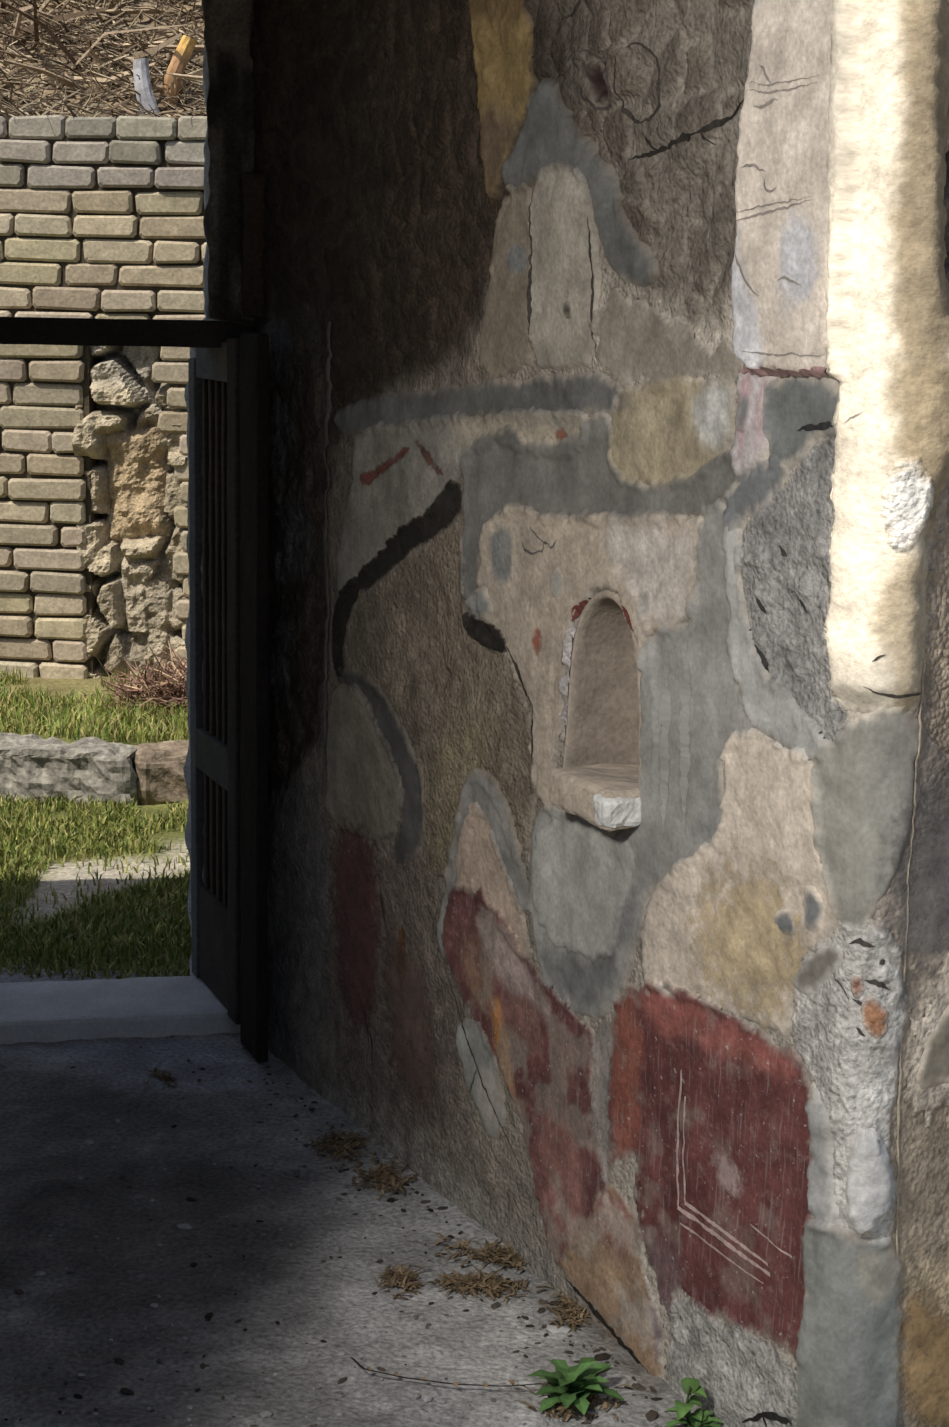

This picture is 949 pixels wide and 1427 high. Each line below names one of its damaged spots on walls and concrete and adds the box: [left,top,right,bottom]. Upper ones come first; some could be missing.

crack [546,0,744,160]
spalling [740,423,851,742]
spalling [774,885,949,1240]
crack [743,1412,792,1427]